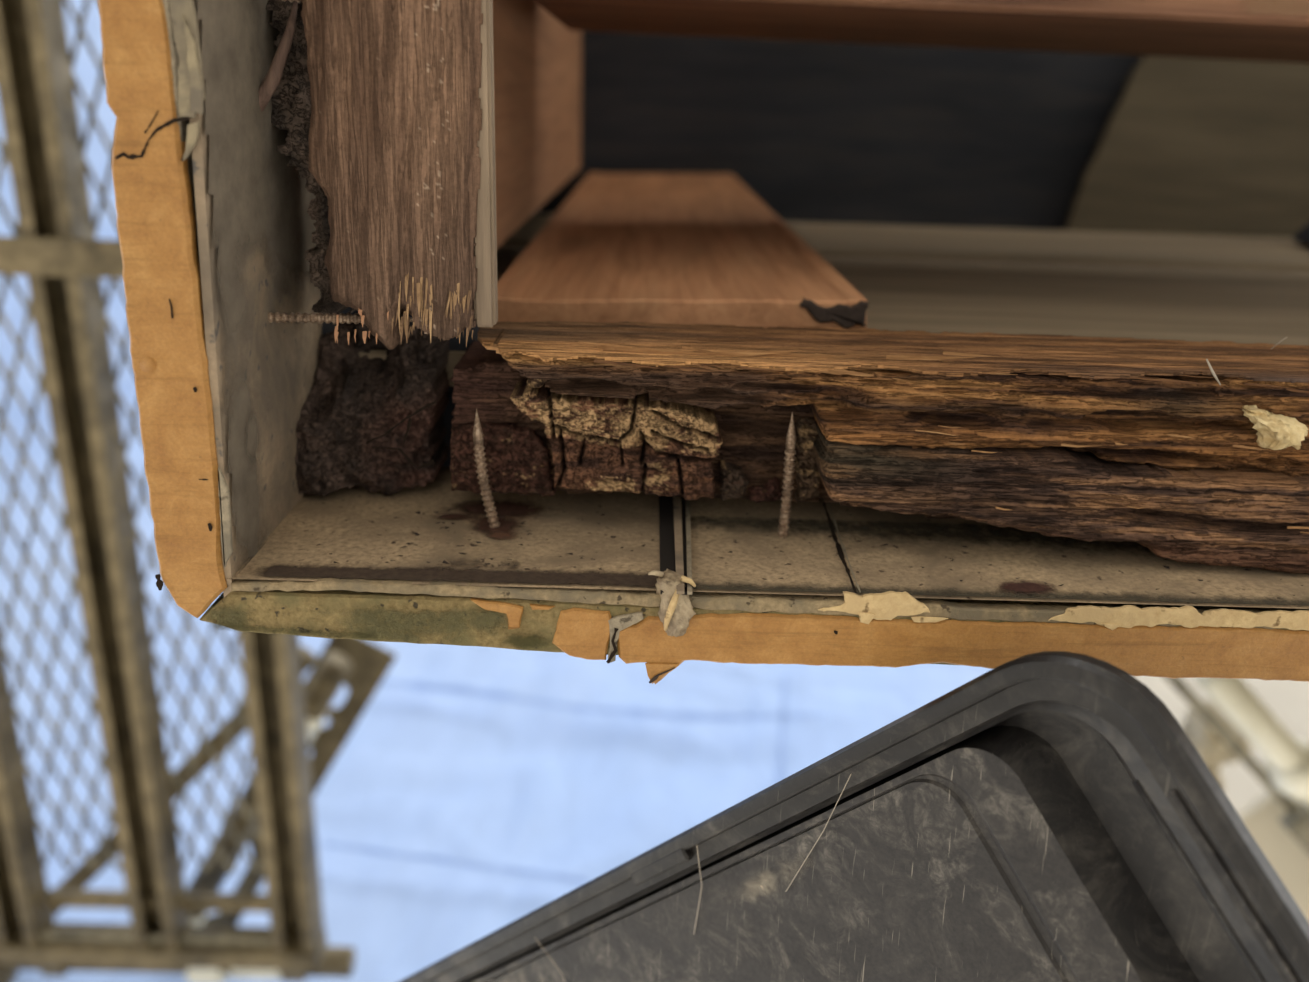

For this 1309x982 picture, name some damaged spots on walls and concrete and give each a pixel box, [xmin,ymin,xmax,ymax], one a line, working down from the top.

crack [115,111,192,161]
crack [823,503,861,593]
peeling [470,597,555,629]
spalling [606,612,644,664]
peeling [818,591,948,624]
peeling [1048,605,1309,631]